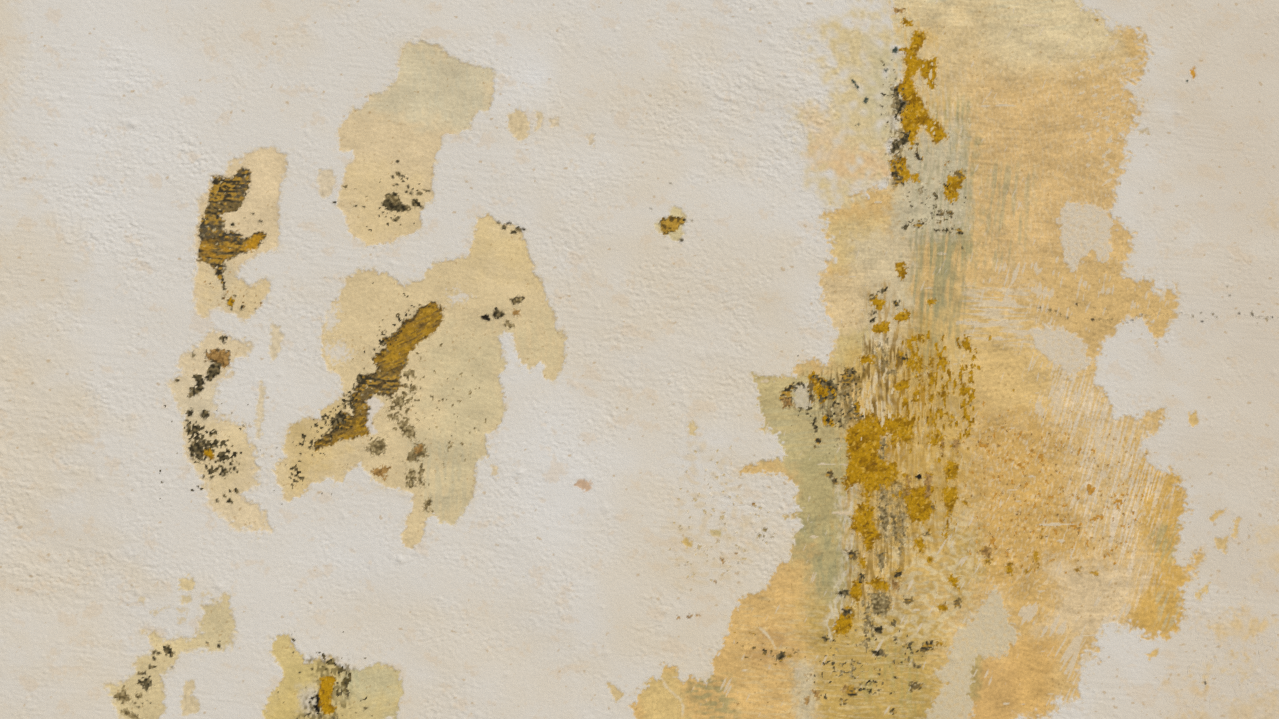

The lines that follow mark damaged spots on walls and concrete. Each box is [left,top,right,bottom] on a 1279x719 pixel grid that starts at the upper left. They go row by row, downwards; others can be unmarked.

peeling [314,39,562,247]
peeling [159,145,569,550]
peeling [604,0,1243,719]
peeling [102,573,239,719]
peeling [260,631,404,719]